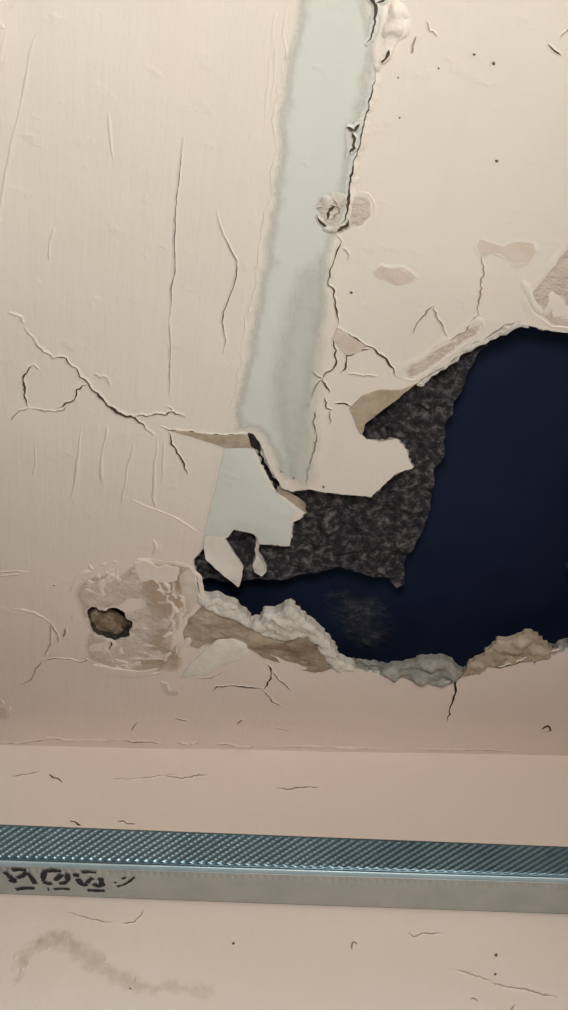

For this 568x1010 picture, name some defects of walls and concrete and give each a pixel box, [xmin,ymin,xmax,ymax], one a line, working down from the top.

crack [8,137,258,475]
crack [305,0,439,488]
peeling [350,236,568,467]
spalling [254,436,307,546]
crack [195,663,292,707]
spalling [69,532,568,696]
crack [446,680,459,722]